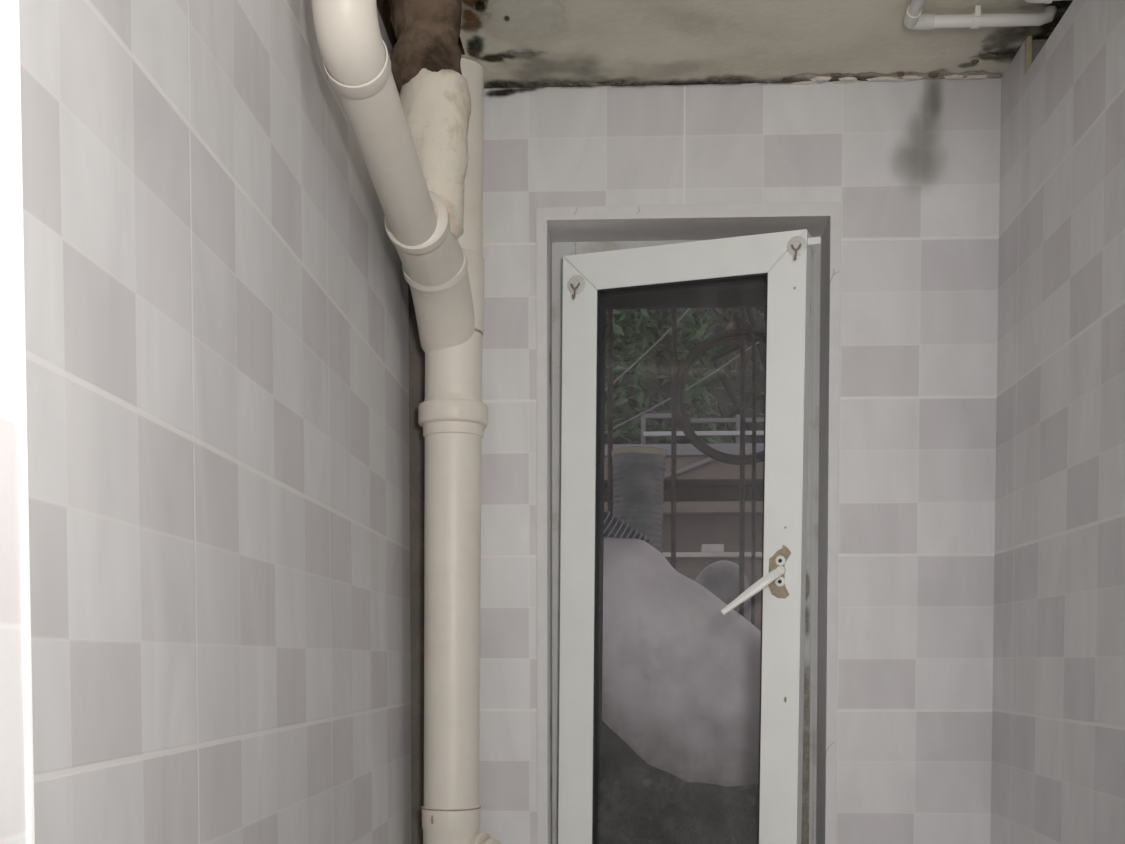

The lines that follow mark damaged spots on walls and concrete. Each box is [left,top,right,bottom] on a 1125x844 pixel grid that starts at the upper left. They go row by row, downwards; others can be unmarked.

water stain [467,37,535,62]
water stain [484,77,803,96]